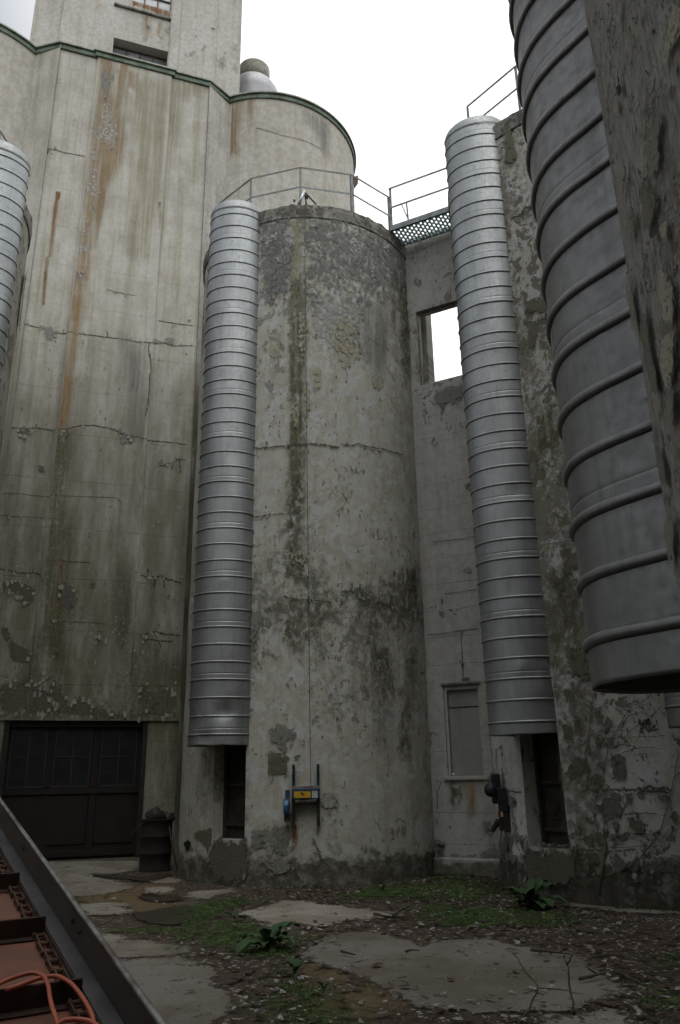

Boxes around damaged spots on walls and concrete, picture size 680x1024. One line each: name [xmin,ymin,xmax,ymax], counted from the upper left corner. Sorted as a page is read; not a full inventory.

peeling [86,72,118,197]
corrosion [51,192,60,243]
corrosion [60,60,134,424]
crack [13,320,193,473]
leakage [290,413,302,526]
crack [254,441,403,455]
peeling [0,627,145,723]
peeling [251,698,300,808]
spalling [184,813,303,883]